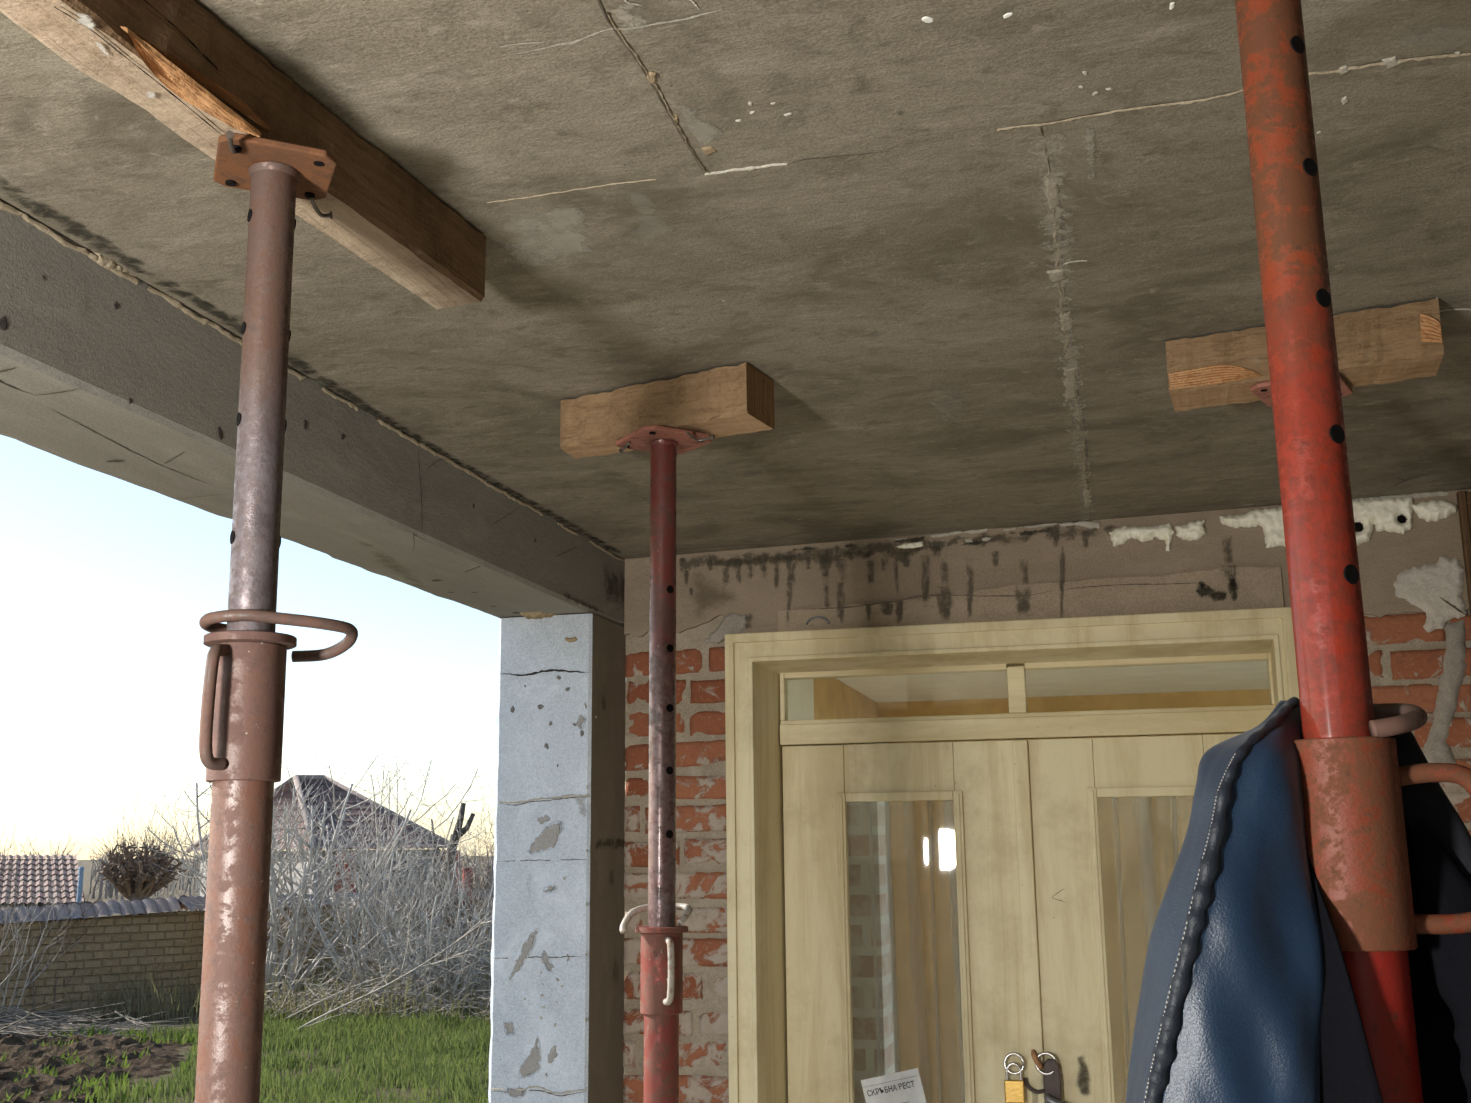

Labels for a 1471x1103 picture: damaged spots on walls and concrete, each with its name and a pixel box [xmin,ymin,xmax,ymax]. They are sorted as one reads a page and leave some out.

crack [500,0,725,174]
crack [793,151,887,163]
damp [679,129,1112,621]
peeling [573,701,597,737]
peeling [530,815,561,854]
peeling [509,931,587,981]
peeling [503,1022,515,1036]
peeling [507,1036,558,1098]